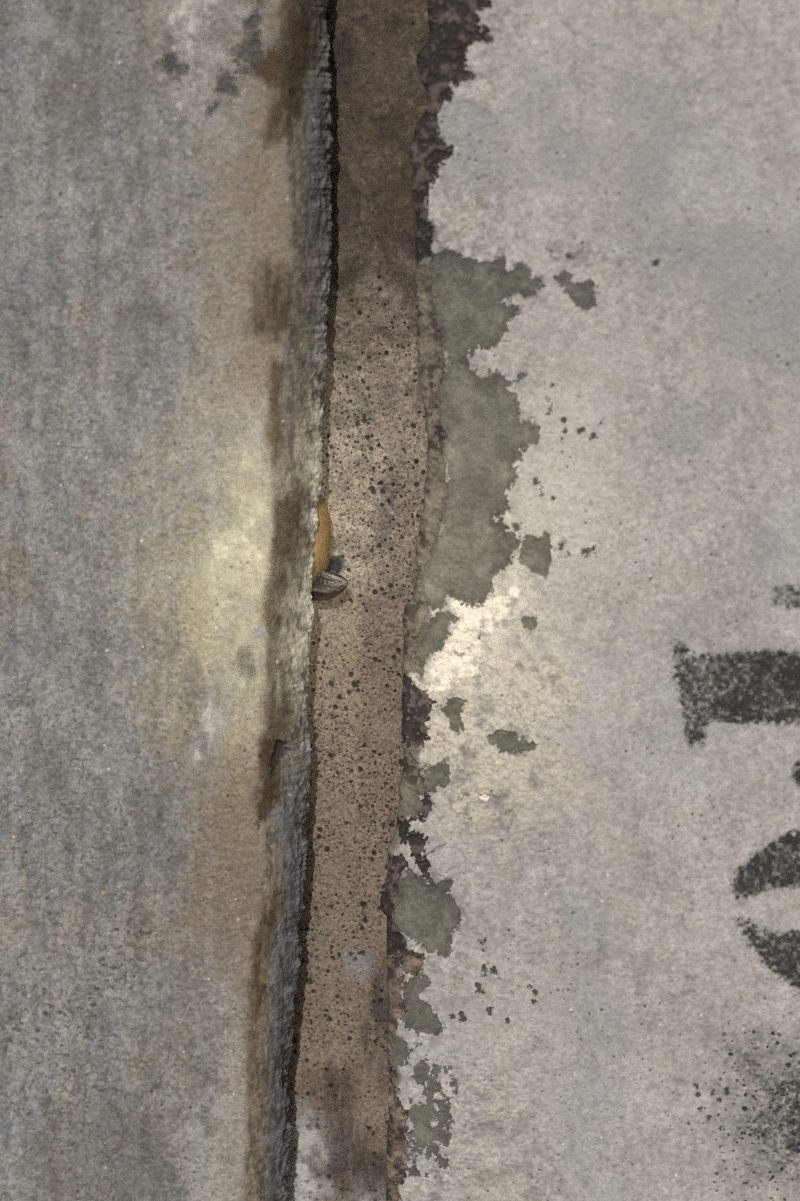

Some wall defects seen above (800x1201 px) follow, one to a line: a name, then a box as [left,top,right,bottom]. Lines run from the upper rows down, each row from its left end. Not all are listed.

rust [252,0,314,140]
rust [254,271,291,333]
rust [268,361,282,463]
rust [263,487,304,639]
peeling [368,0,602,1201]
rust [258,665,284,817]
rust [247,910,275,1070]